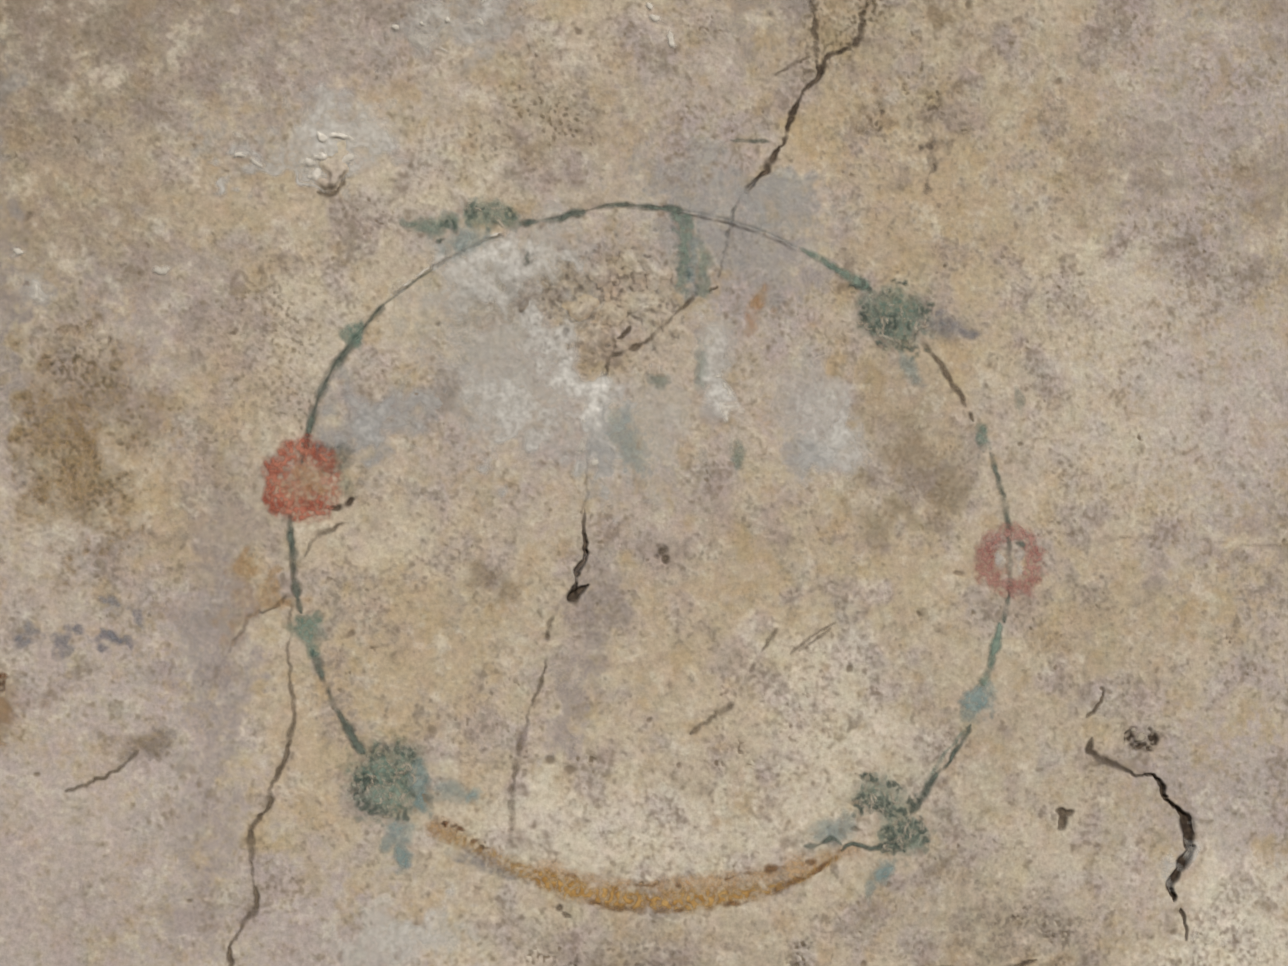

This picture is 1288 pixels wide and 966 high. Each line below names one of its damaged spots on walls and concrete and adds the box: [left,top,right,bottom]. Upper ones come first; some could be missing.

crack [725,0,876,246]
peeling [305,132,354,196]
crack [678,287,718,311]
crack [601,327,653,402]
crack [567,521,588,602]
crack [233,598,284,641]
crack [1086,691,1104,755]
crack [248,685,294,846]
crack [1124,769,1195,939]
crack [227,886,259,966]